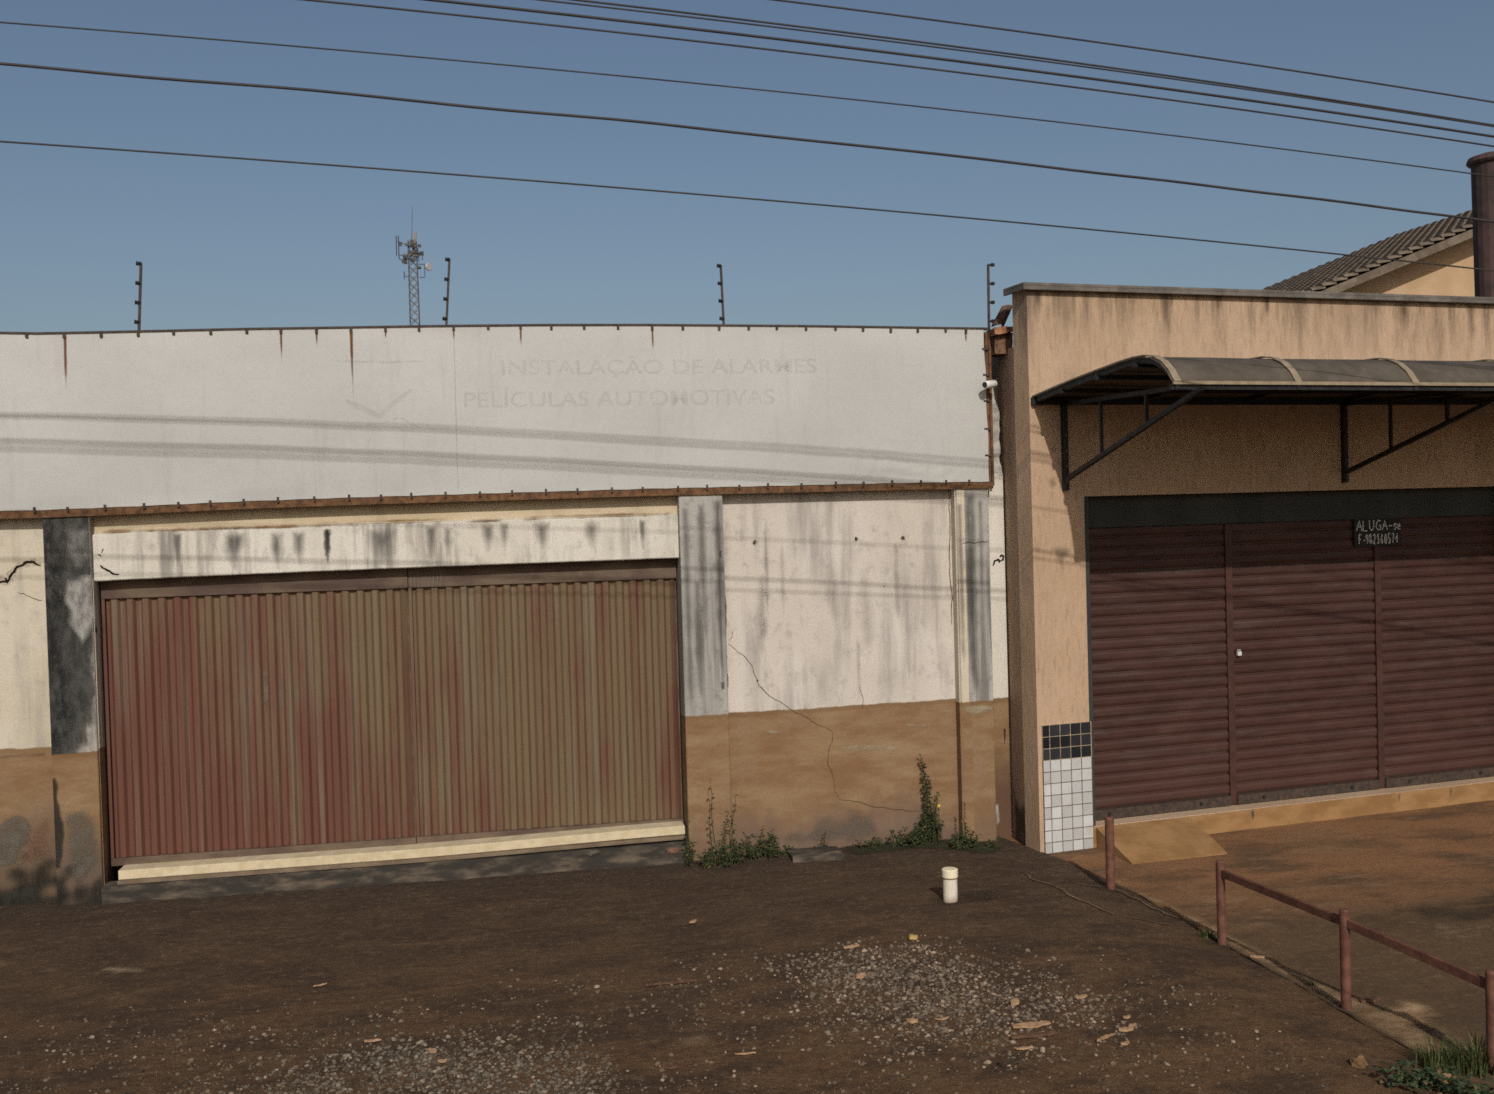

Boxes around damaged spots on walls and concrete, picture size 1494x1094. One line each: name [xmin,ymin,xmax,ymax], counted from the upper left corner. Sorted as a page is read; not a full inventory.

crack [0,558,42,601]
water stain [43,516,95,755]
water stain [700,511,721,592]
water stain [960,542,974,614]
crack [725,597,913,812]
water stain [0,779,102,906]